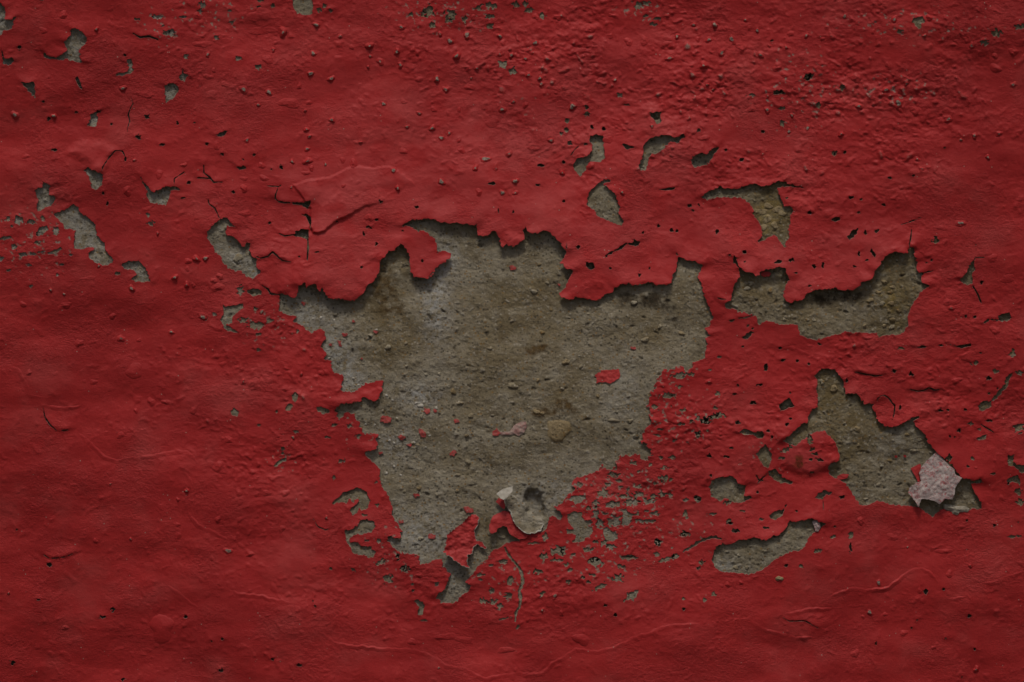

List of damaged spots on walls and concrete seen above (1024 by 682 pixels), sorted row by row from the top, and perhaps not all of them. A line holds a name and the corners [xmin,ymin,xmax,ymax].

peeling [623,112,685,170]
peeling [0,182,150,282]
peeling [587,179,623,226]
peeling [702,181,802,247]
peeling [205,218,995,629]